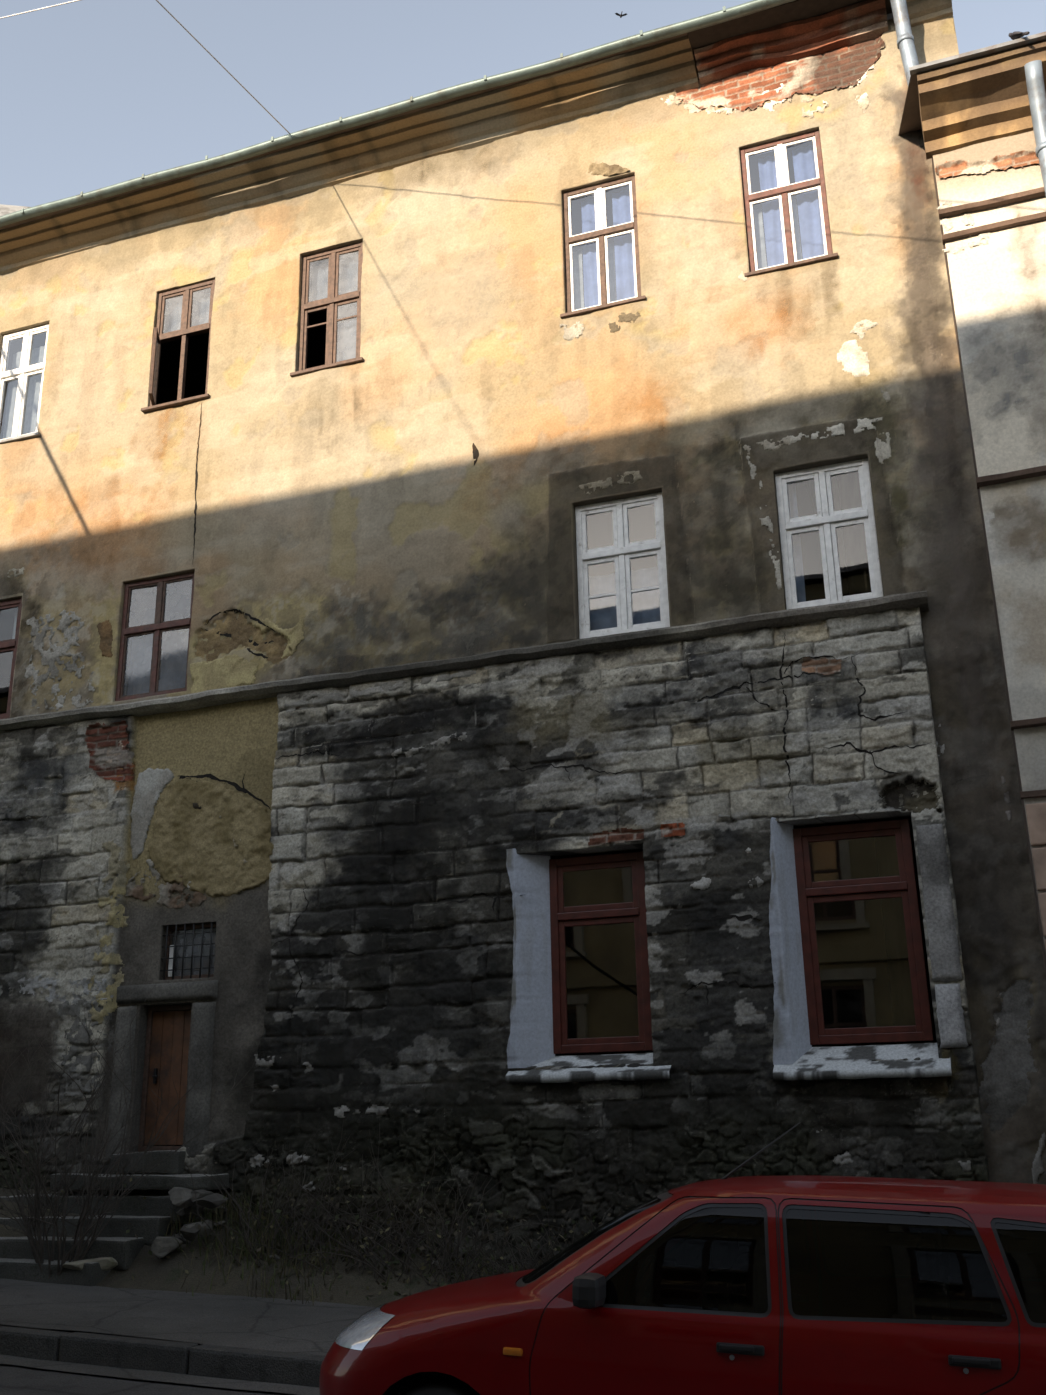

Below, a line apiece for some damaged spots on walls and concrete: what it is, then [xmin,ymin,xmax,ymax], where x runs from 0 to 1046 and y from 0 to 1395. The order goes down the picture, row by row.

flaking render [661,35,885,119]
flaking render [935,150,1040,178]
peeling [837,319,878,377]
peeling [743,388,892,489]
crack [179,774,271,810]
crack [278,750,346,759]
leakage [305,696,486,756]
crack [689,633,932,804]
peeling [18,720,207,1100]
leakage [875,1053,957,1109]
leakage [321,1078,491,1224]
leakage [566,1087,722,1212]